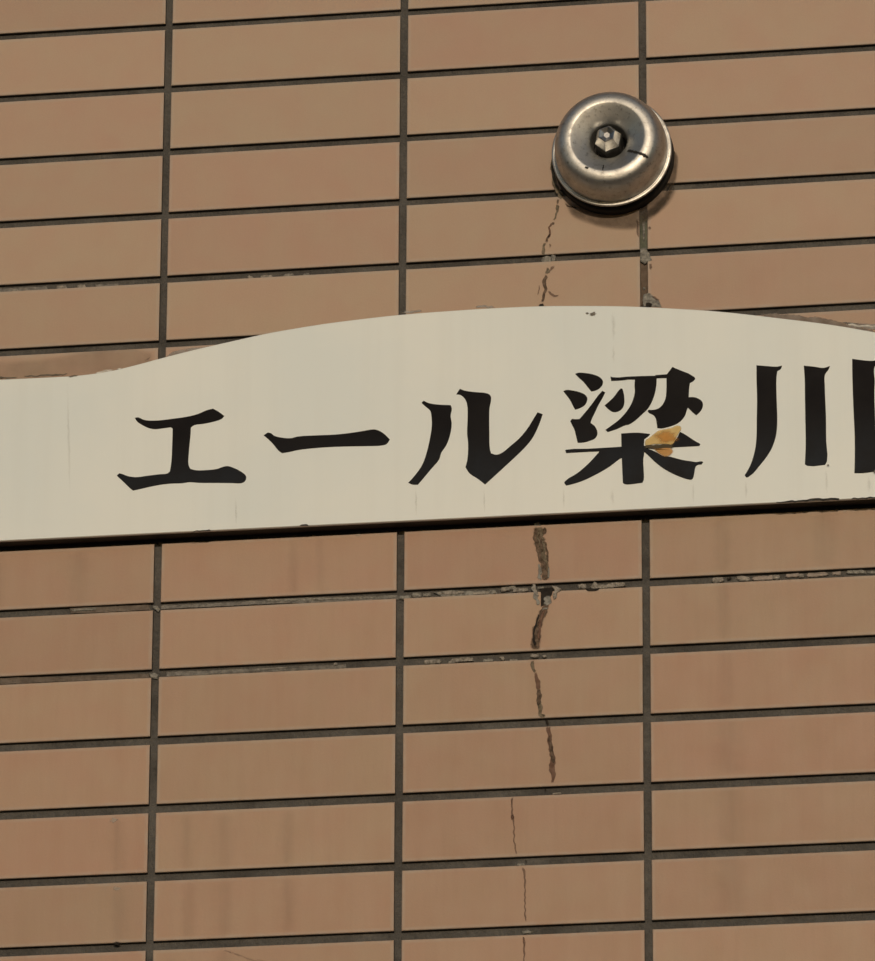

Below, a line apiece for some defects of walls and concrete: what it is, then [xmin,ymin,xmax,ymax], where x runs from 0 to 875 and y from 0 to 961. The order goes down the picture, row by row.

crack [538,200,559,306]
rust [645,426,681,456]
spalling [712,570,875,583]
spalling [399,586,544,600]
crack [530,522,561,782]